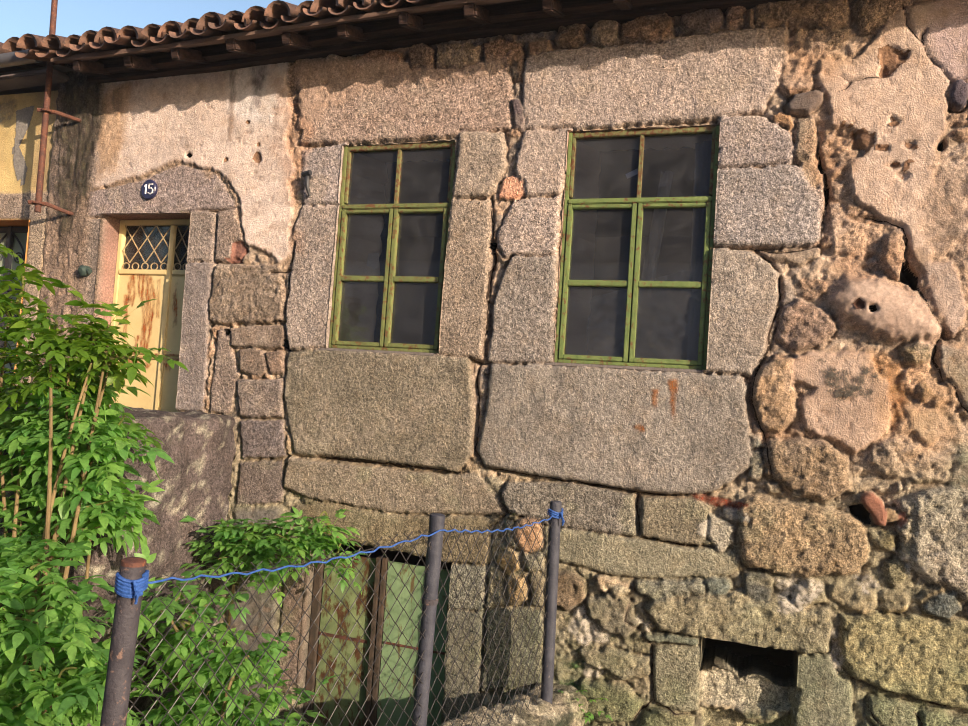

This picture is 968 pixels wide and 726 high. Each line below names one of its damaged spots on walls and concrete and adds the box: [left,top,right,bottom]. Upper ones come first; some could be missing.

spalling [877,44,911,78]
crack [903,7,946,76]
peeling [12,106,34,186]
damp [55,75,119,233]
crack [750,133,829,254]
spalling [840,120,889,155]
spalling [891,142,919,180]
crack [865,218,909,268]
rust [124,274,155,349]
crack [916,288,968,412]
rust [669,380,678,413]